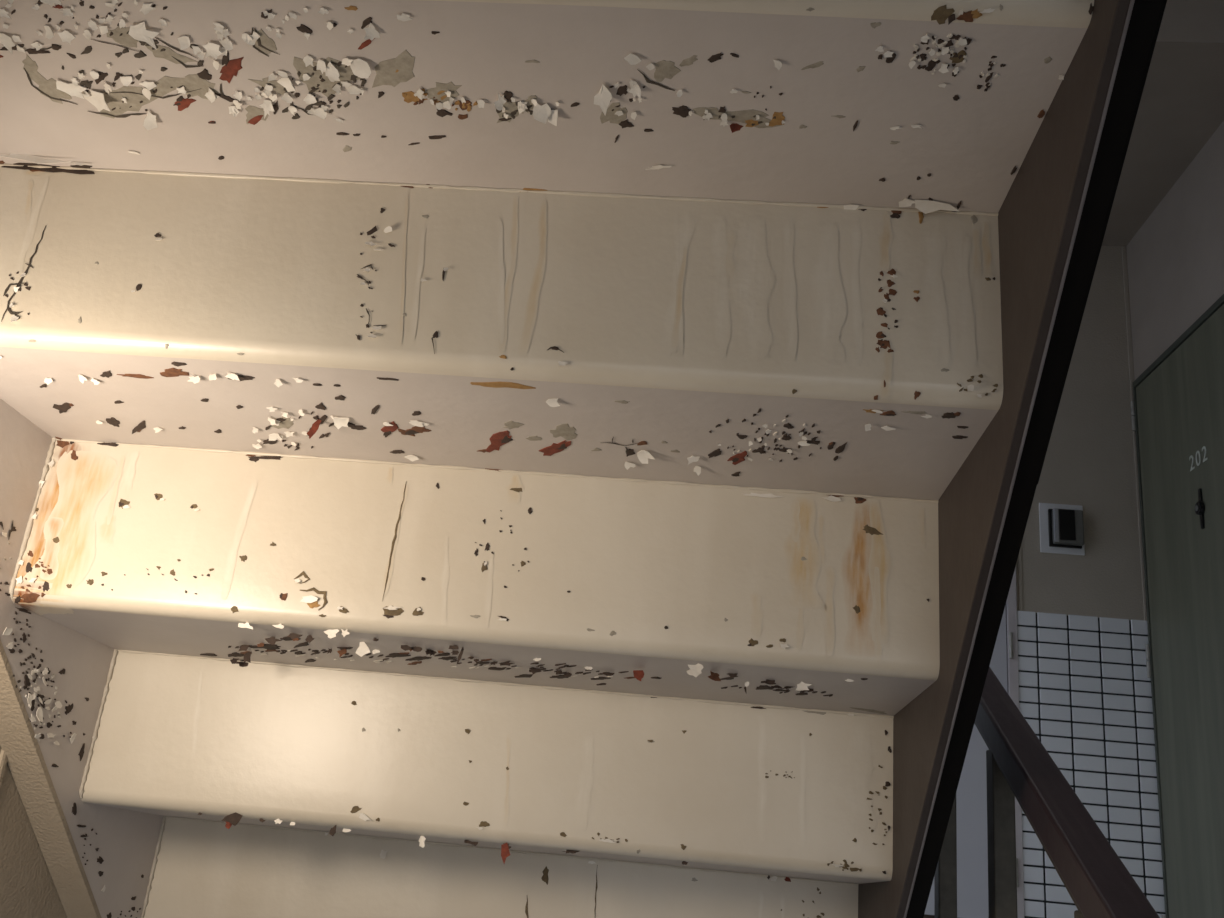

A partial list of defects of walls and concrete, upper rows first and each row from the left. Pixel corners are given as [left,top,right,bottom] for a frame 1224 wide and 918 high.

peeling [0,0,785,152]
crack [1,226,46,322]
rust [53,402,74,414]
rust [96,400,162,434]
peeling [78,344,255,385]
peeling [246,378,431,462]
peeling [687,408,847,477]
peeling [3,607,89,761]
rust [11,437,118,615]
crack [382,481,409,600]
peeling [200,571,661,685]
rust [743,493,892,663]